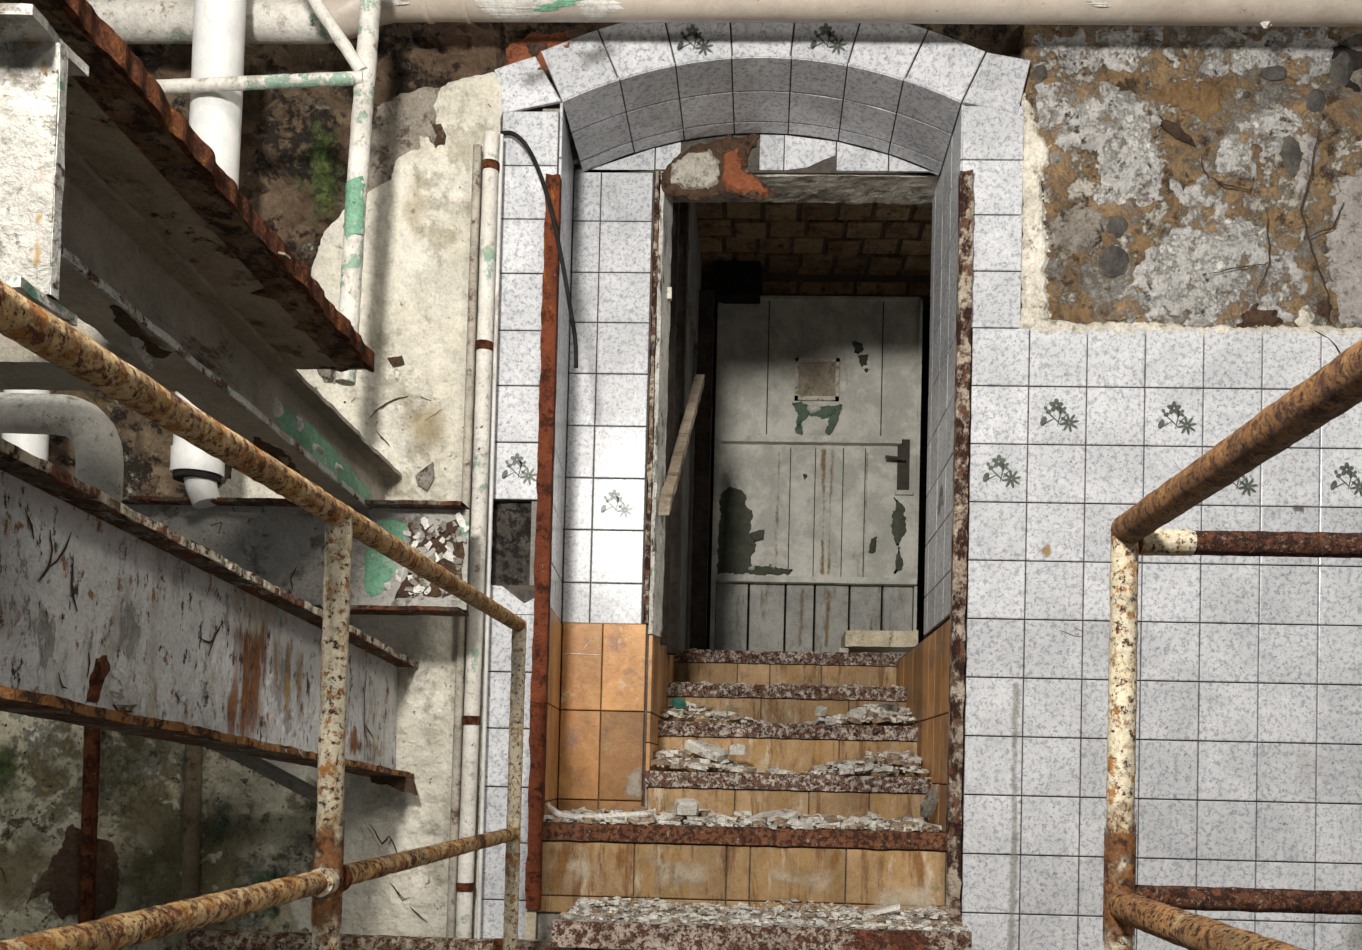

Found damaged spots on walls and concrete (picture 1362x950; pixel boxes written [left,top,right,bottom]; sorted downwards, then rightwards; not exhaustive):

flaking render [432,124,446,145]
corrosion [3,0,375,373]
flaking render [1018,21,1362,338]
flaking render [387,356,405,383]
peeling [792,401,842,435]
peeling [360,547,452,599]
peeling [376,512,469,580]
peeling [492,502,532,585]
peeling [716,487,791,576]
peeling [868,499,907,574]
corrosion [0,622,318,761]
corrosion [345,726,414,779]